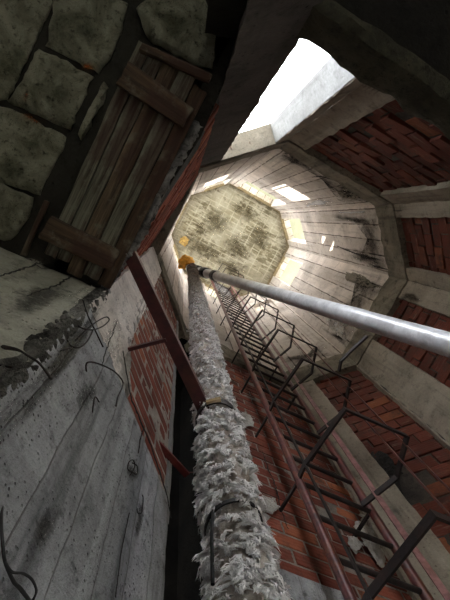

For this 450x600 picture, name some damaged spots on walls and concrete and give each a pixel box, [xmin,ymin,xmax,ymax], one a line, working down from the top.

crack [0,262,52,276]
crack [27,274,72,296]
spalling [0,120,202,399]
mould [190,209,223,258]
damp [336,211,385,269]
damp [351,278,373,308]
spalling [347,514,386,568]